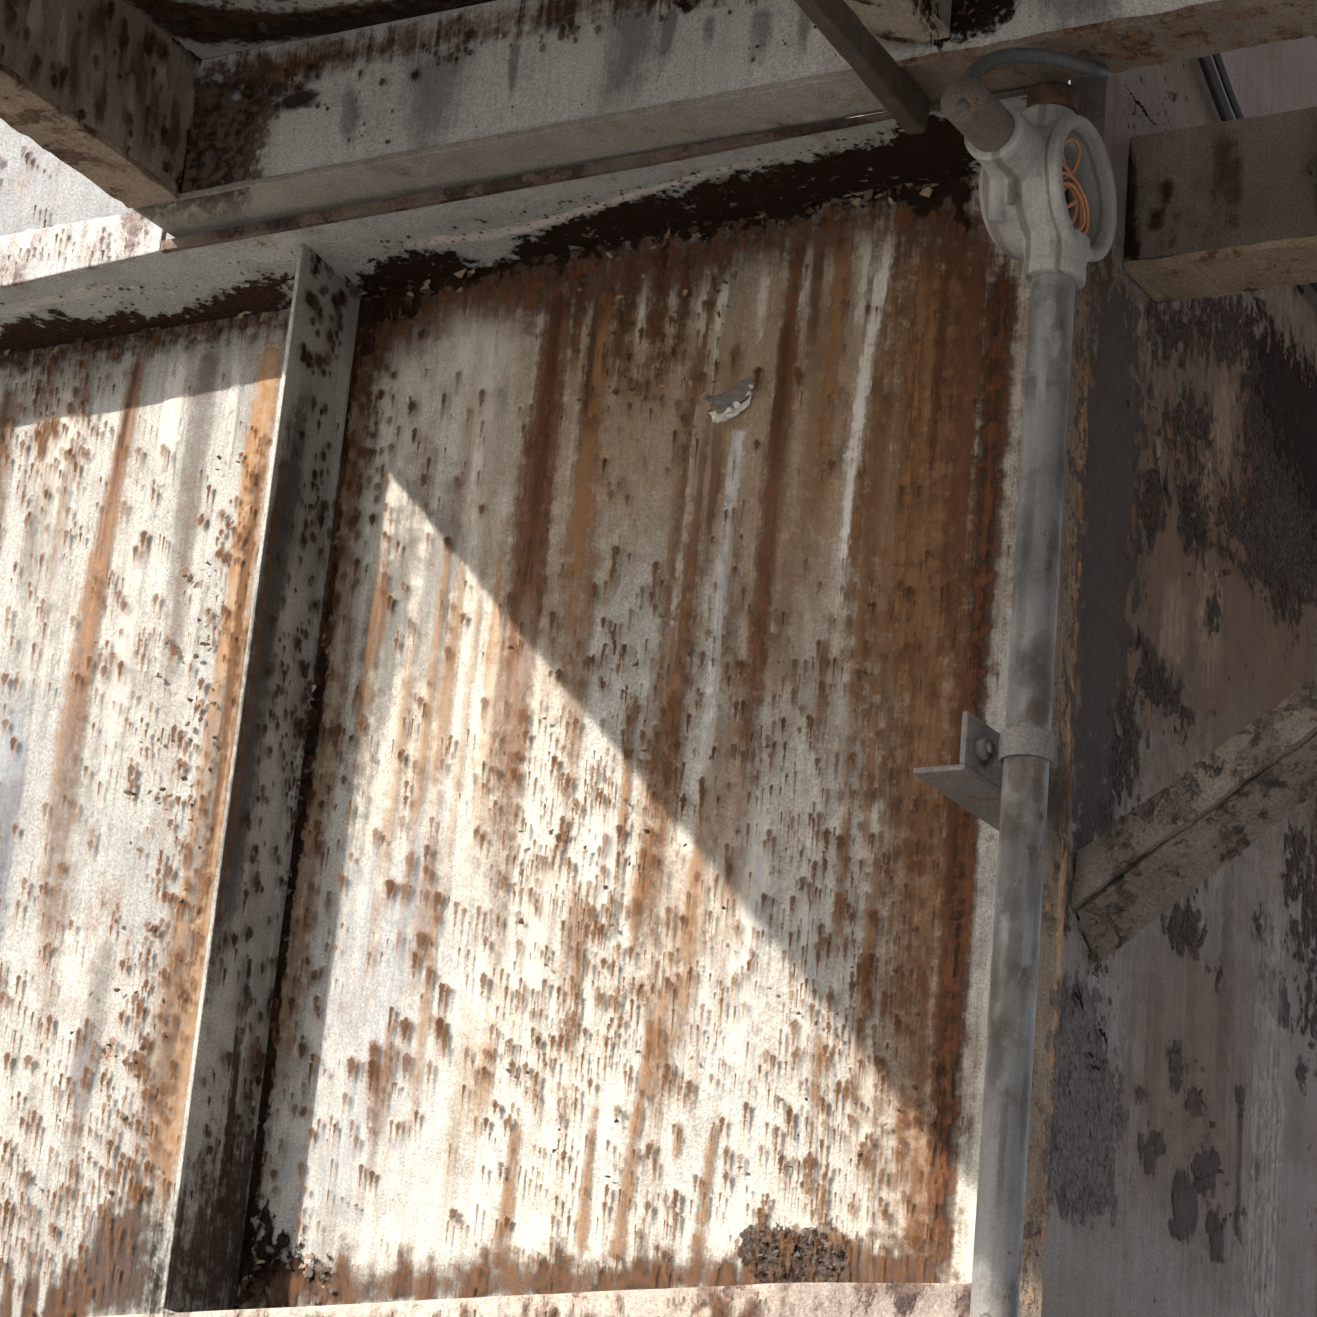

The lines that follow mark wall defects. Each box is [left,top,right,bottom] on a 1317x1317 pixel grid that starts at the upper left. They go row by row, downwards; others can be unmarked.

rust [69,0,717,227]
peeling [709,377,758,423]
rust [0,110,1029,1317]